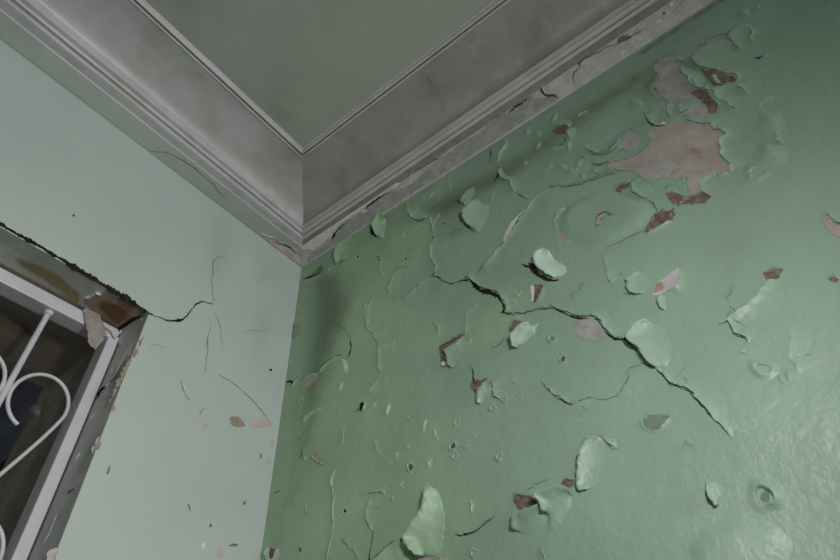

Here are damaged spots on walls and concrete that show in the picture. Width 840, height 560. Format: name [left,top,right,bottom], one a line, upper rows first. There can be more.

spalling [260,92,561,266]
spalling [549,23,761,240]
spalling [83,291,145,422]
crack [0,222,269,420]
spalling [439,329,504,404]
peeling [492,316,539,348]
peeling [522,248,566,303]
crack [402,186,738,436]
peeling [624,318,672,368]
peeling [719,264,784,354]
peeling [372,483,451,560]
spalling [510,432,618,535]